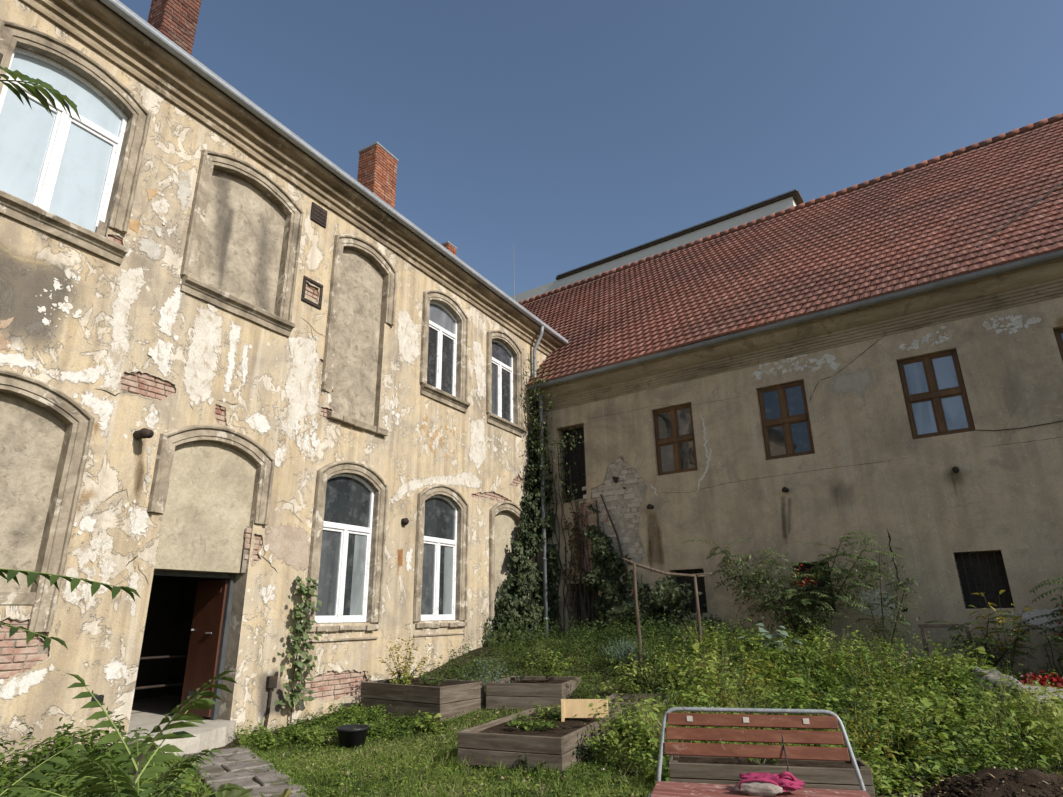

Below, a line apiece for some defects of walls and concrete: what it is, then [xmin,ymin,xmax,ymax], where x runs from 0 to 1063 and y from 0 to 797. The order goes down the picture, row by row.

peeling [61,515,116,611]
peeling [0,170,252,443]
peeling [125,572,140,617]
peeling [124,442,157,537]
peeling [245,336,339,467]
spalling [305,281,319,303]
peeling [382,386,400,432]
peeling [397,310,420,365]
spalling [571,455,648,577]
crack [590,397,905,496]
peeling [751,353,840,381]
spalling [0,616,55,701]